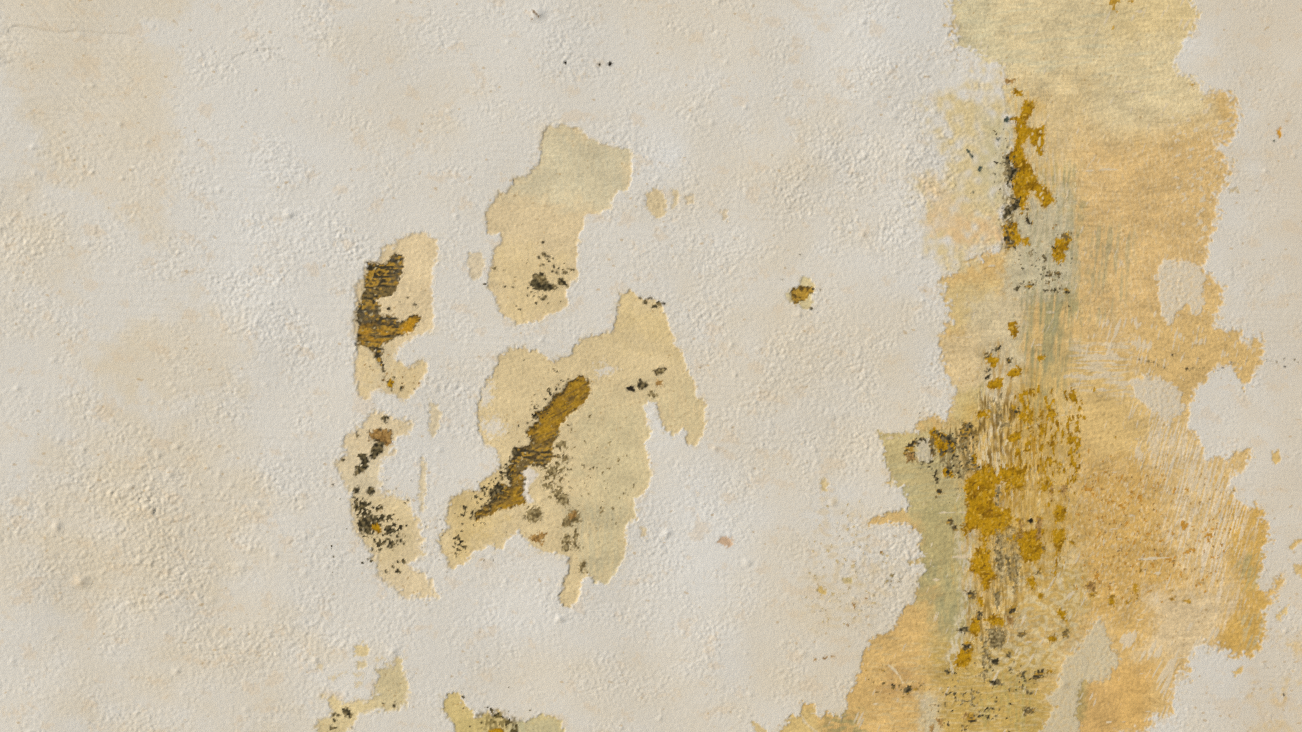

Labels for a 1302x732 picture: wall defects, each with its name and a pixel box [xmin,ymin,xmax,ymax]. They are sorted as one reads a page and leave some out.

peeling [465,122,697,326]
peeling [331,230,709,609]
peeling [749,0,1302,732]
peeling [312,640,412,732]
peeling [440,689,566,732]